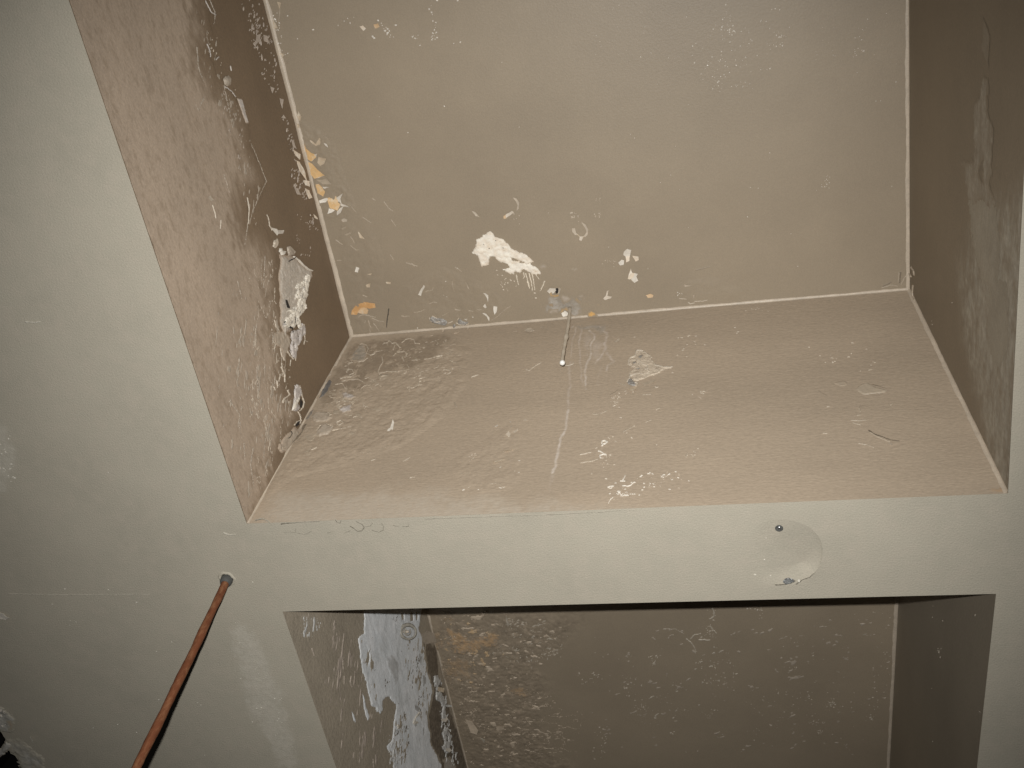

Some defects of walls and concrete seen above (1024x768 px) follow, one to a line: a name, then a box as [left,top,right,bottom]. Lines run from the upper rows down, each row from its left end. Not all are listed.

peeling [70,0,477,522]
spalling [472,231,548,299]
peeling [602,249,639,283]
water stain [951,17,1024,489]
spalling [579,349,690,504]
peeling [299,604,596,768]
peeling [609,608,740,746]